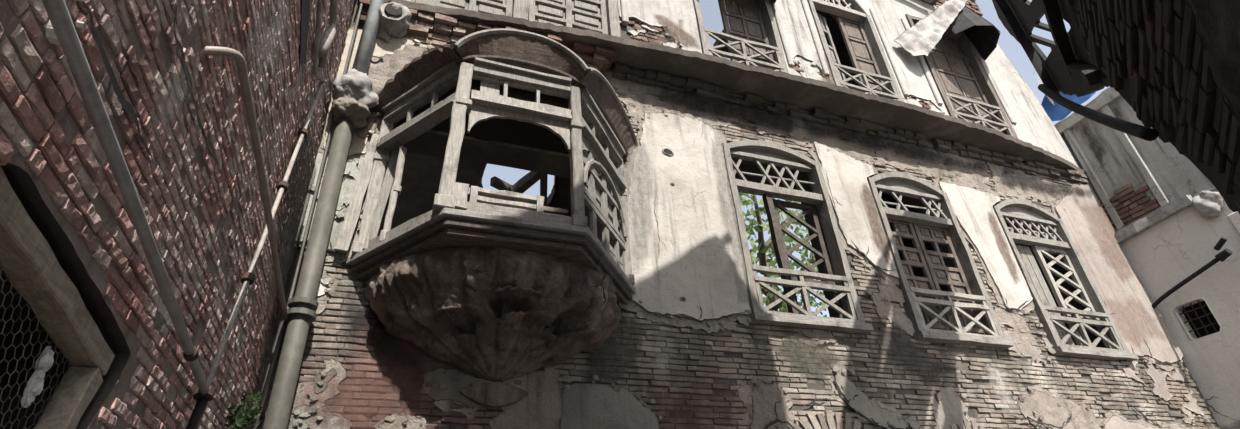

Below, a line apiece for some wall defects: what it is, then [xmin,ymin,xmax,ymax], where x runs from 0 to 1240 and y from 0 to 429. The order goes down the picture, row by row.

flaking render [619,18,683,48]
peeling [315,270,341,315]
flaking render [861,259,915,337]
peeling [798,328,836,347]
flaking render [993,305,1056,365]
peeling [287,358,352,429]
peeling [374,413,427,429]
peeling [421,364,574,429]
peeling [736,378,797,429]
peeling [828,361,971,429]
peeling [1016,385,1105,429]
flaking render [1121,358,1208,424]